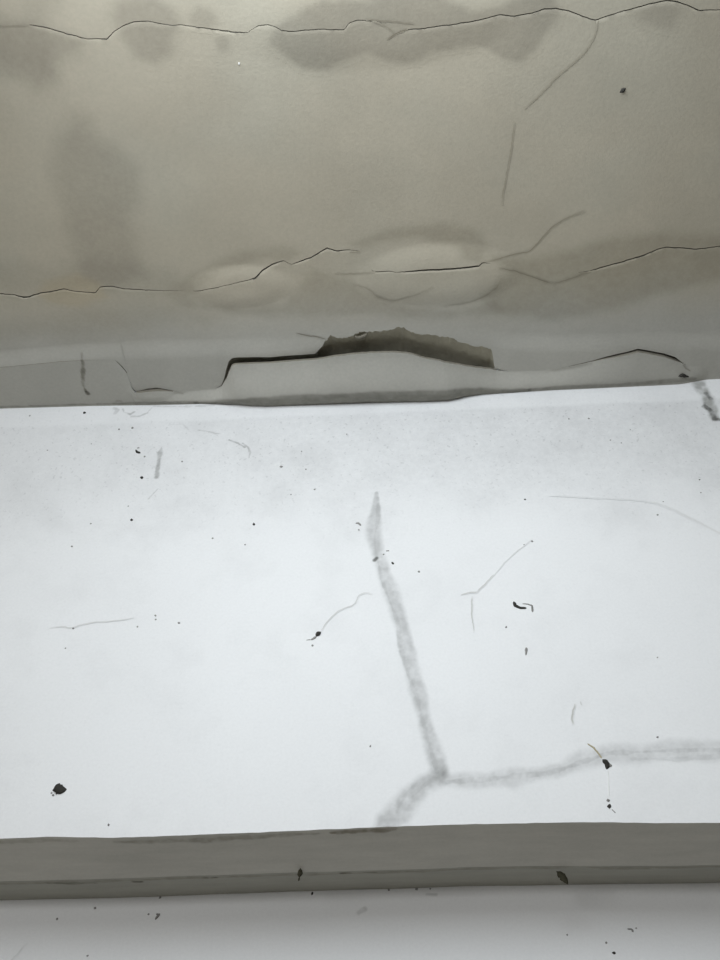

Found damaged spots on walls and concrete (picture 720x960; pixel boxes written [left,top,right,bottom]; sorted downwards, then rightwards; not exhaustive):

crack [0,0,720,205]
crack [0,286,173,298]
leakage [0,0,720,422]
peeling [219,327,501,398]
crack [199,211,720,307]
crack [320,491,720,827]